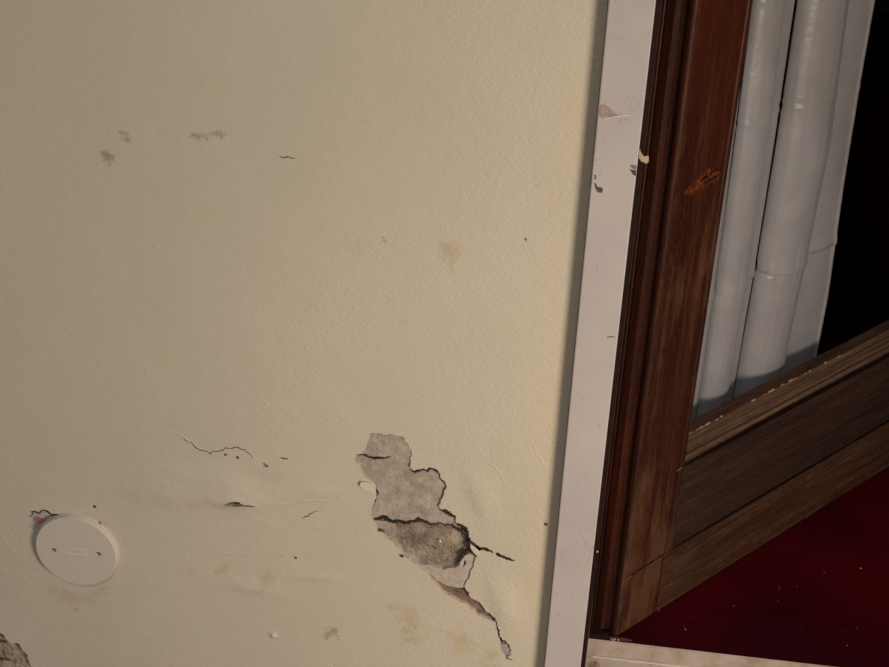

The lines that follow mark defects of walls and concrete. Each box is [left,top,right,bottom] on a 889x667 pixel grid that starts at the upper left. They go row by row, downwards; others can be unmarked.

crack [182,437,253,459]
spalling [29,510,59,529]
spalling [355,433,482,593]
spalling [0,633,31,667]